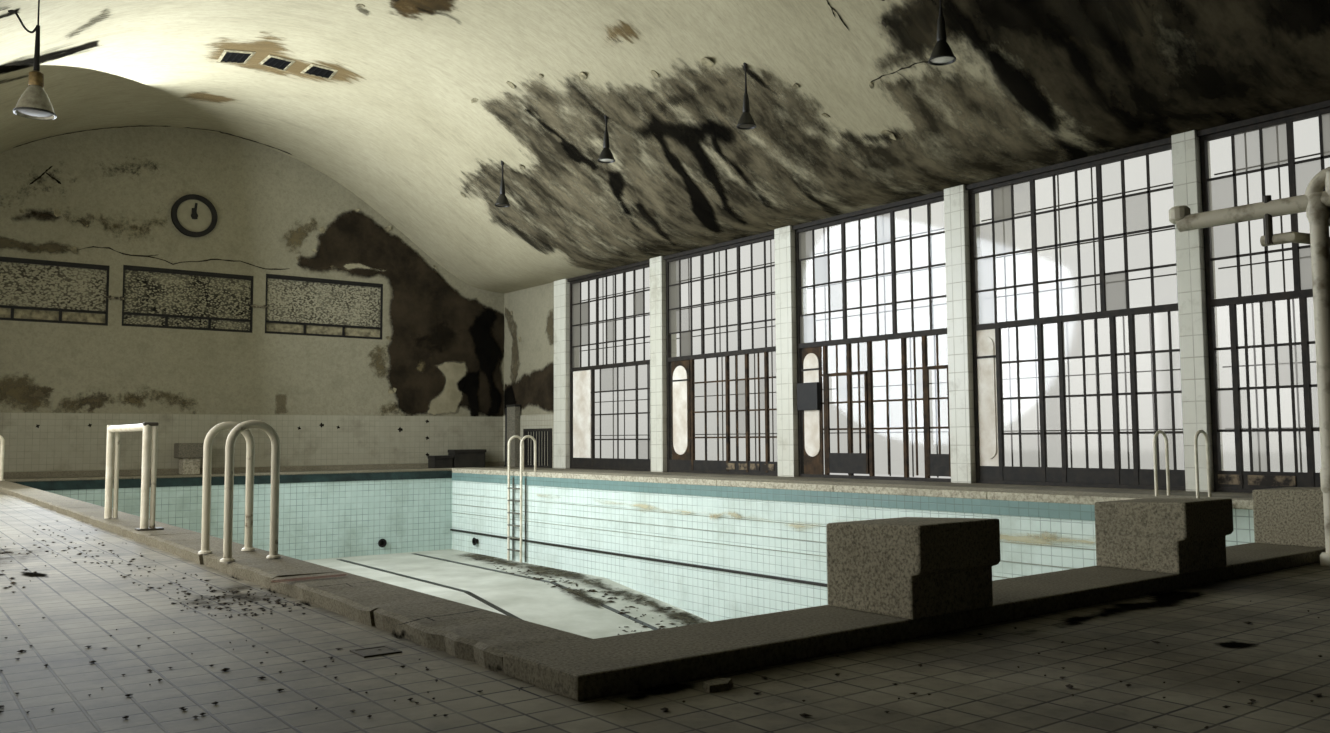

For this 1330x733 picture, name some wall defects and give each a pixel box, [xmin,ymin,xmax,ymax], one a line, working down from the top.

damp [0,10,109,84]
damp [880,0,1330,160]
flaking render [296,208,554,417]
damp [0,375,195,414]